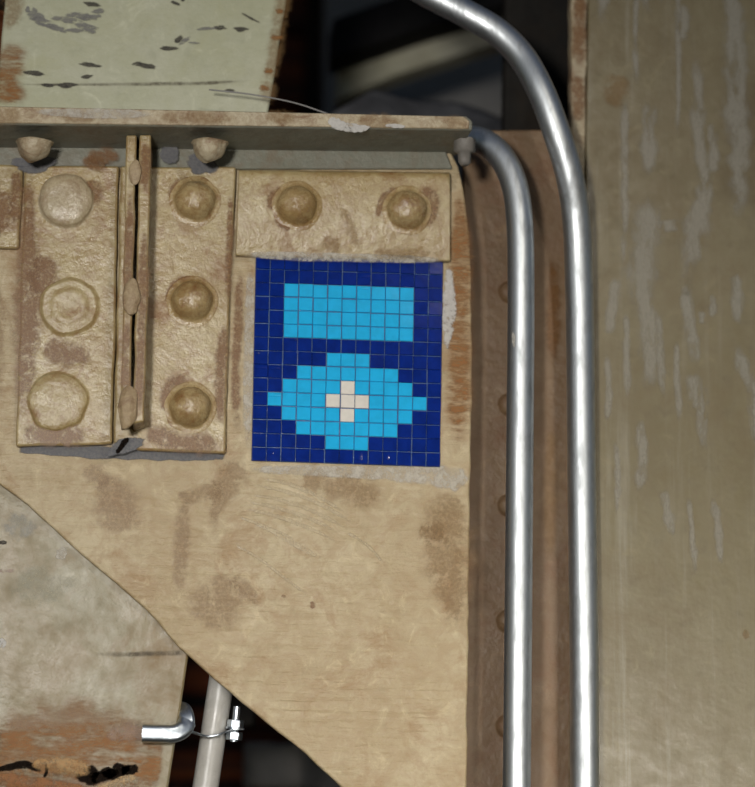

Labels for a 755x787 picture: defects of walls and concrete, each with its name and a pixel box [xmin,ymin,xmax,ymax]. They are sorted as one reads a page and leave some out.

peeling [25,2,103,34]
peeling [160,35,200,51]
peeling [197,13,259,32]
corrosion [0,47,22,102]
peeling [23,62,101,88]
leakage [725,0,749,201]
leakage [622,69,718,442]
corrosion [0,705,161,787]